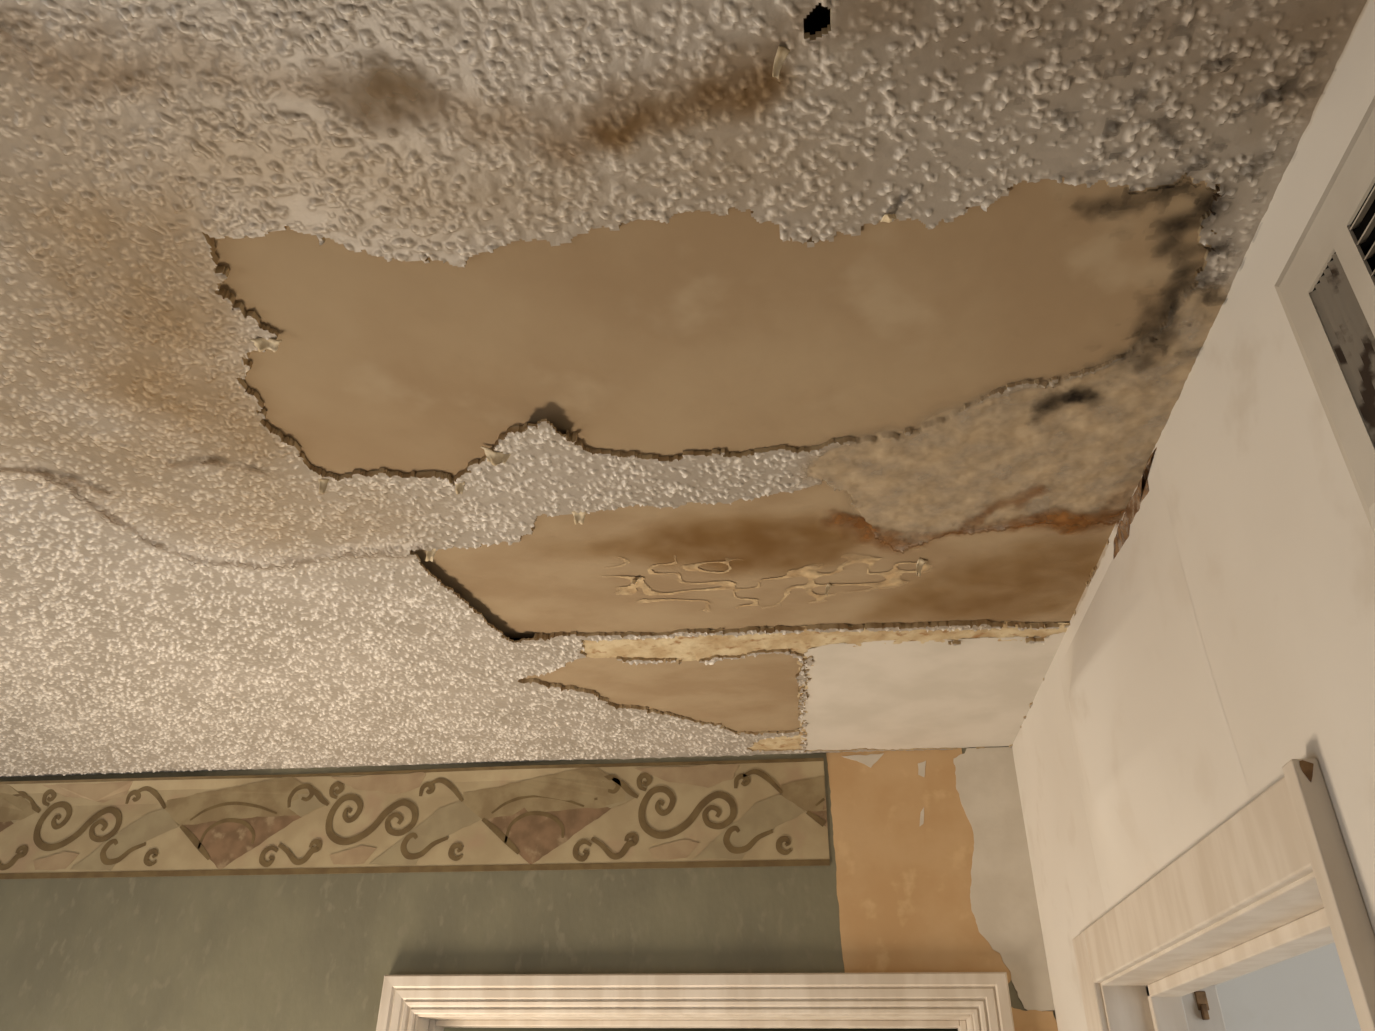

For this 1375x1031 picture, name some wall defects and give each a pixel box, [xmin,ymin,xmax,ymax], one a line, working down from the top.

damp [1165,191,1220,236]
peeling [214,174,1215,494]
damp [1034,390,1098,421]
crack [201,459,253,471]
peeling [388,448,1157,663]
peeling [842,753,884,768]